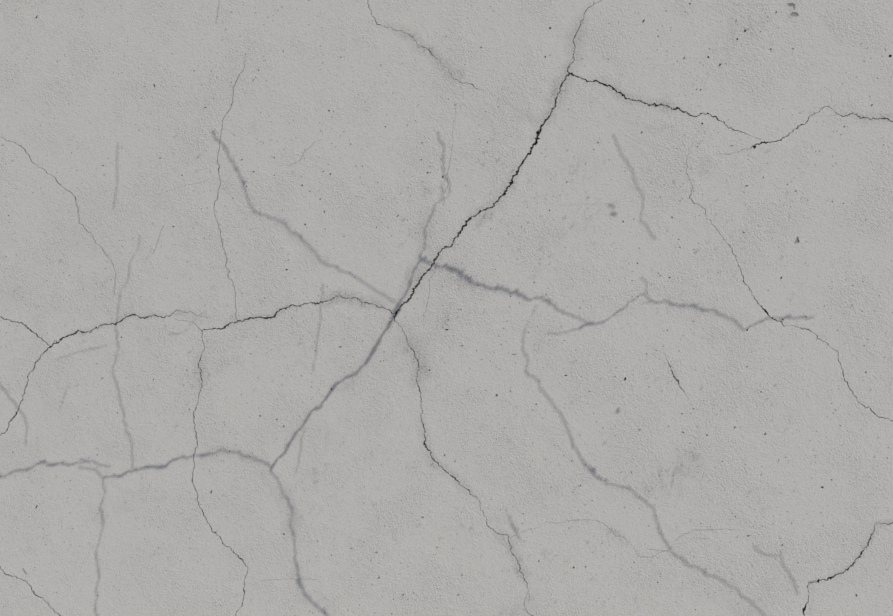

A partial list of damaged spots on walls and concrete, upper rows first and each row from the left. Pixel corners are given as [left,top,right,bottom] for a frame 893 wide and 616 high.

crack [0,53,348,616]
crack [356,1,893,339]
crack [686,130,891,421]
crack [410,347,569,616]
crack [802,522,893,616]